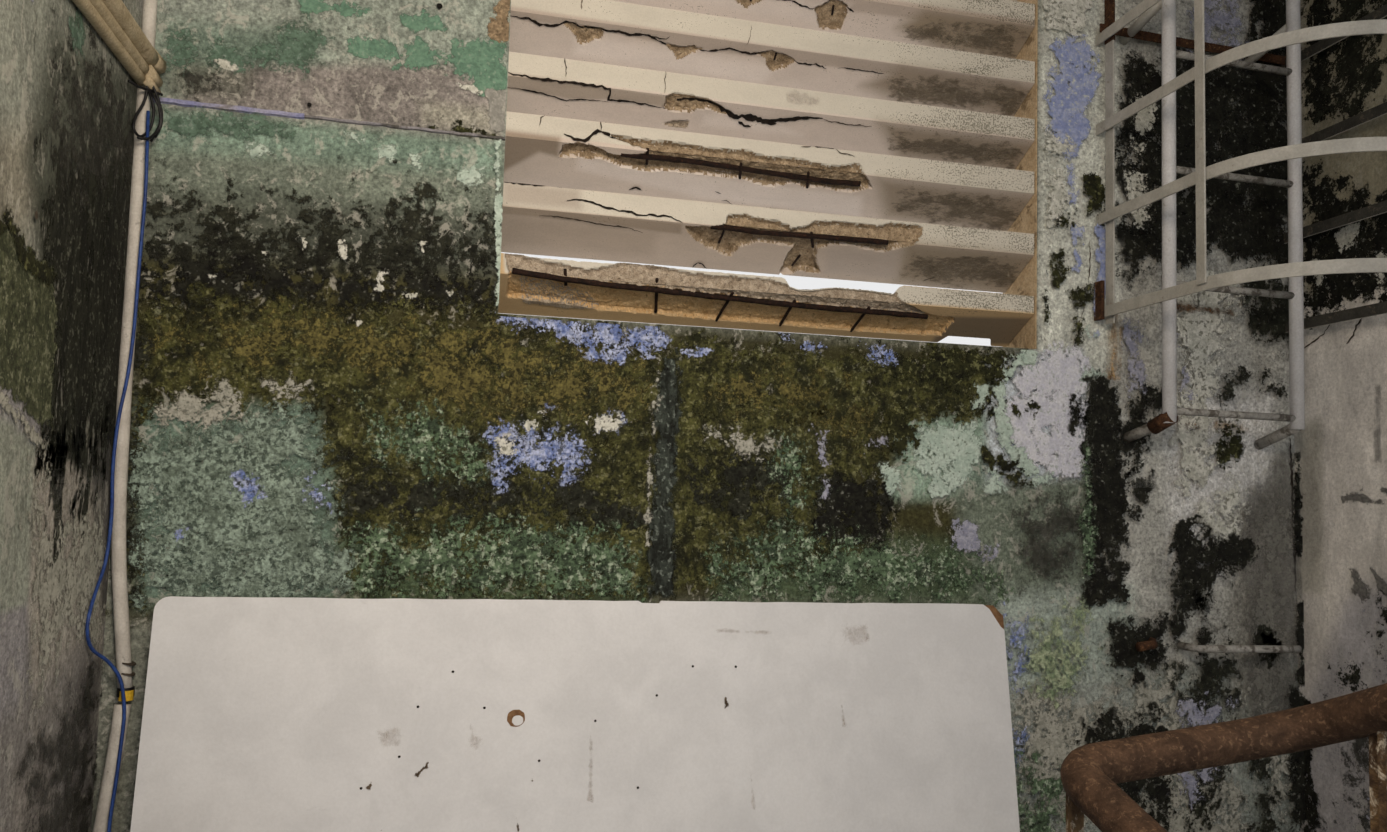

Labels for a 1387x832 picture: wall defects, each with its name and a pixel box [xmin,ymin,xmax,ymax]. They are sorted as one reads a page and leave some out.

spalling [814,0,848,30]
crack [507,0,884,157]
spalling [560,93,871,191]
water stain [0,9,503,608]
peeling [338,239,348,260]
peeling [374,271,387,292]
spalling [456,139,954,547]
corrosion [1177,302,1234,316]
water stain [1115,0,1387,460]
water stain [1293,452,1304,557]
water stain [1253,589,1387,708]
water stain [1116,737,1370,832]